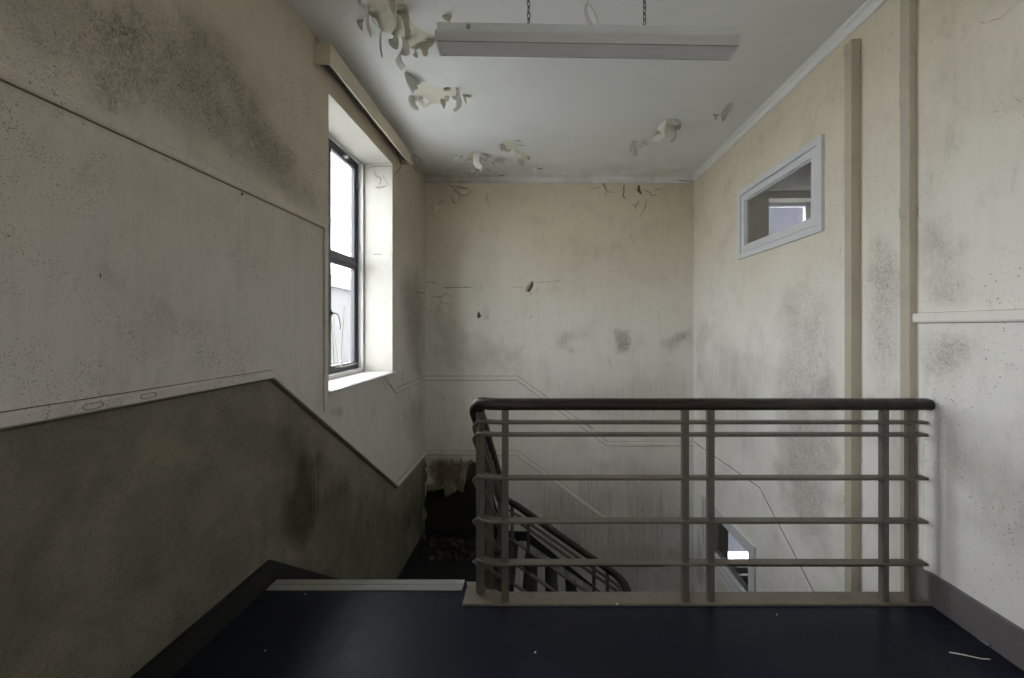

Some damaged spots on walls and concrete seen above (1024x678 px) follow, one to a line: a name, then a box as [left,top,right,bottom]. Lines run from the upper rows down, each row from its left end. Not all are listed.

peeling [357,0,471,112]
peeling [629,118,681,156]
peeling [466,139,543,176]
crack [587,183,647,218]
peeling [511,279,560,297]